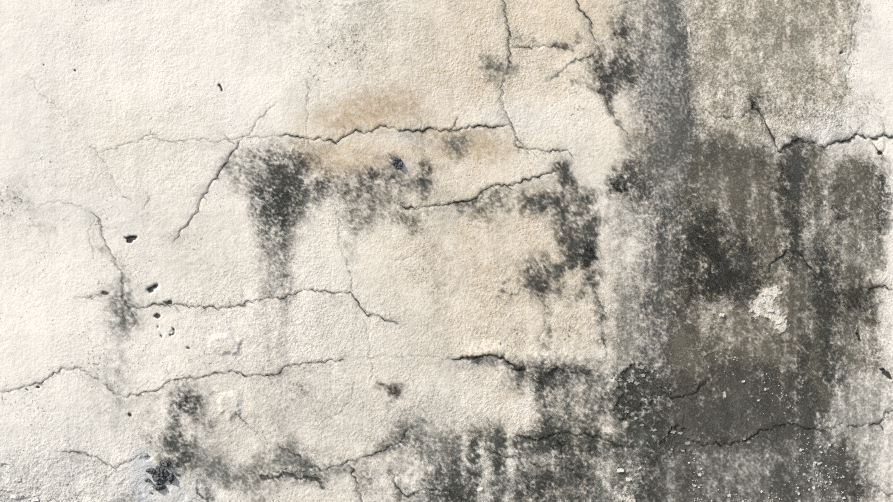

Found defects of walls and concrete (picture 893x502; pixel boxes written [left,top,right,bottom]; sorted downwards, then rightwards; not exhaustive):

crack [151,111,267,239]
damp [226,144,432,256]
crack [282,0,604,210]
crack [706,102,893,190]
crack [89,214,398,324]
damp [435,0,891,502]
crack [765,250,817,283]
crack [452,354,590,389]
crack [278,410,422,501]
crack [393,475,451,501]
crack [498,432,629,488]
crack [690,412,890,447]